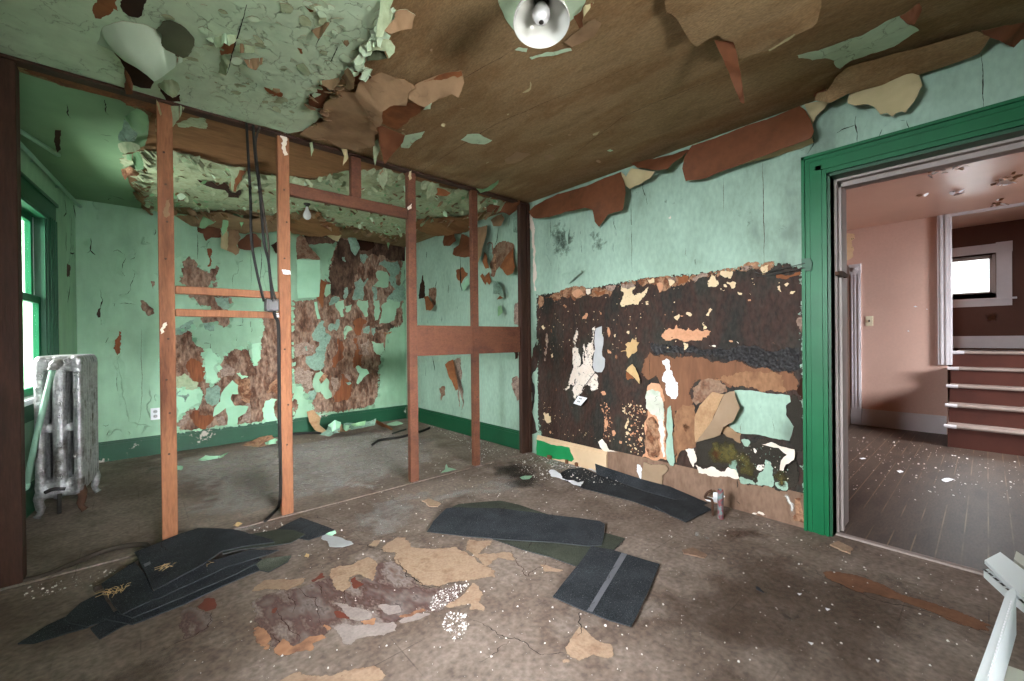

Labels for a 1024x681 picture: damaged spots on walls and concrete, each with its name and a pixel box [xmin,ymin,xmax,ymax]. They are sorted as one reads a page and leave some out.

peeling [97,0,416,128]
peeling [515,47,572,59]
peeling [798,2,922,69]
peeling [981,22,1024,48]
peeling [118,108,157,215]
peeling [173,151,278,433]
peeling [289,126,518,433]
peeling [593,326,605,372]
peeling [626,364,640,384]
peeling [662,325,711,342]
peeling [694,391,740,442]
peeling [763,442,795,471]